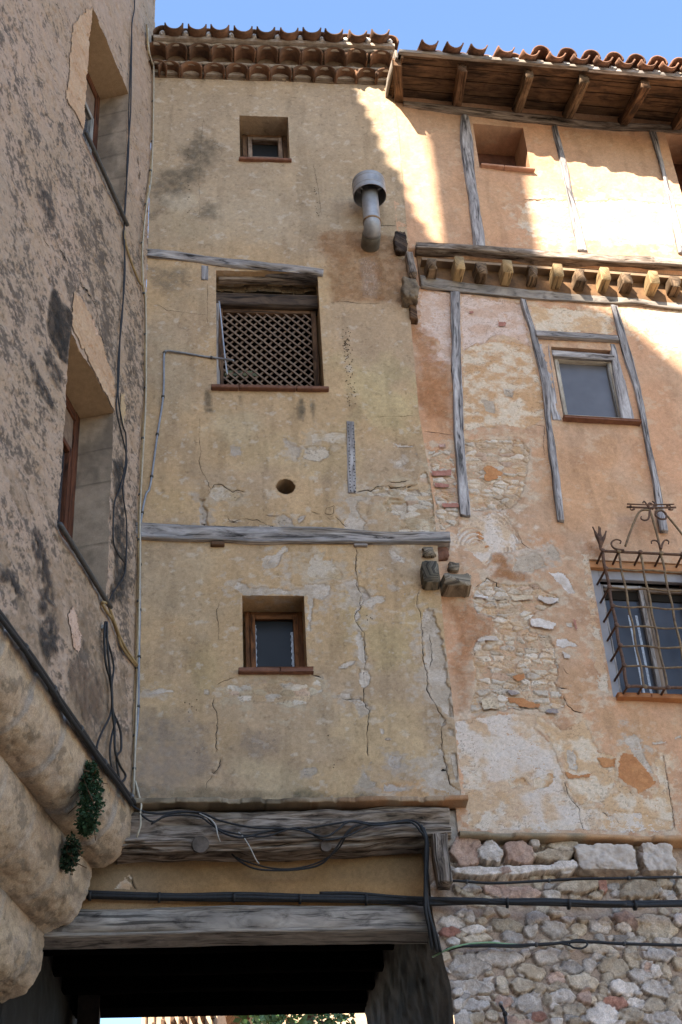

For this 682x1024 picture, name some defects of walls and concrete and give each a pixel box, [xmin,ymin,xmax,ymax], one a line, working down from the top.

peeling [283,432,346,462]
peeling [344,290,614,532]
crack [416,594,452,786]
peeling [420,546,681,833]